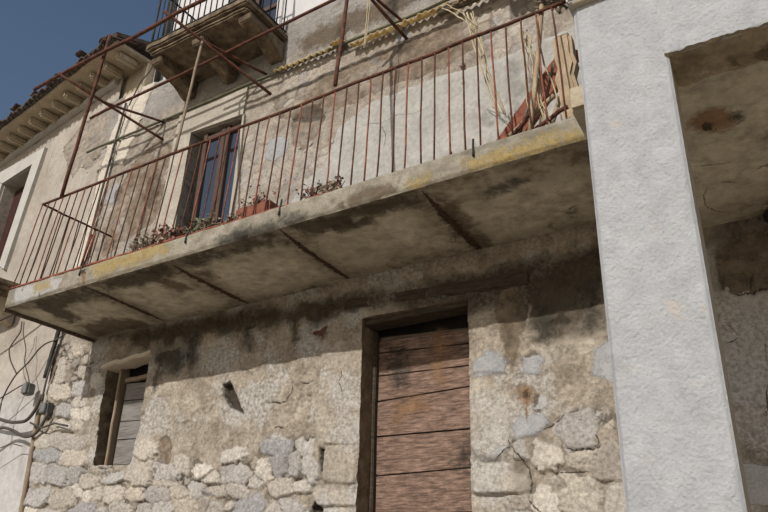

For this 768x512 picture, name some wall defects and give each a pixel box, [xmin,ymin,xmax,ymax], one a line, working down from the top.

flaking render [273,8,577,203]
spalling [14,278,62,305]
spalling [62,80,172,282]
leakage [30,287,356,387]
leakage [185,186,422,278]
crack [280,230,350,279]
crack [422,191,482,250]
rust [521,386,531,419]